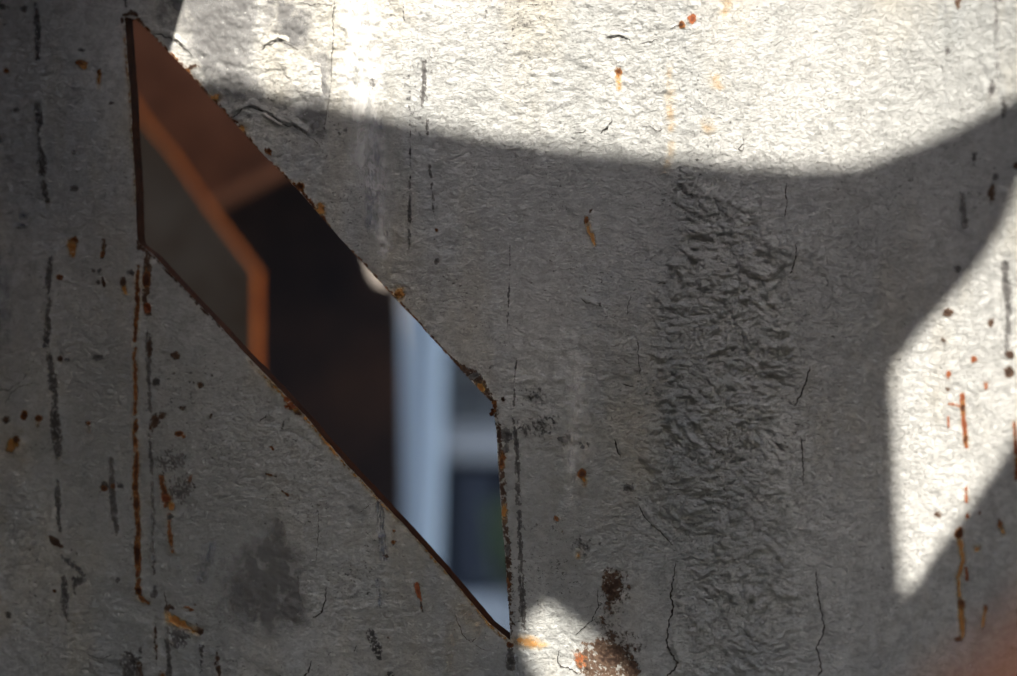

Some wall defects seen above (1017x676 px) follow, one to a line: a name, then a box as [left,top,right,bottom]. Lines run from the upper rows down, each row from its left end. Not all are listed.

leakage [163,0,309,102]
leakage [300,60,328,137]
corrosion [120,239,223,605]
corrosion [264,375,407,558]
corrosion [347,245,543,647]
corrosion [946,371,968,448]
corrosion [557,568,642,676]
crack [639,503,693,676]
corrosion [954,486,981,642]